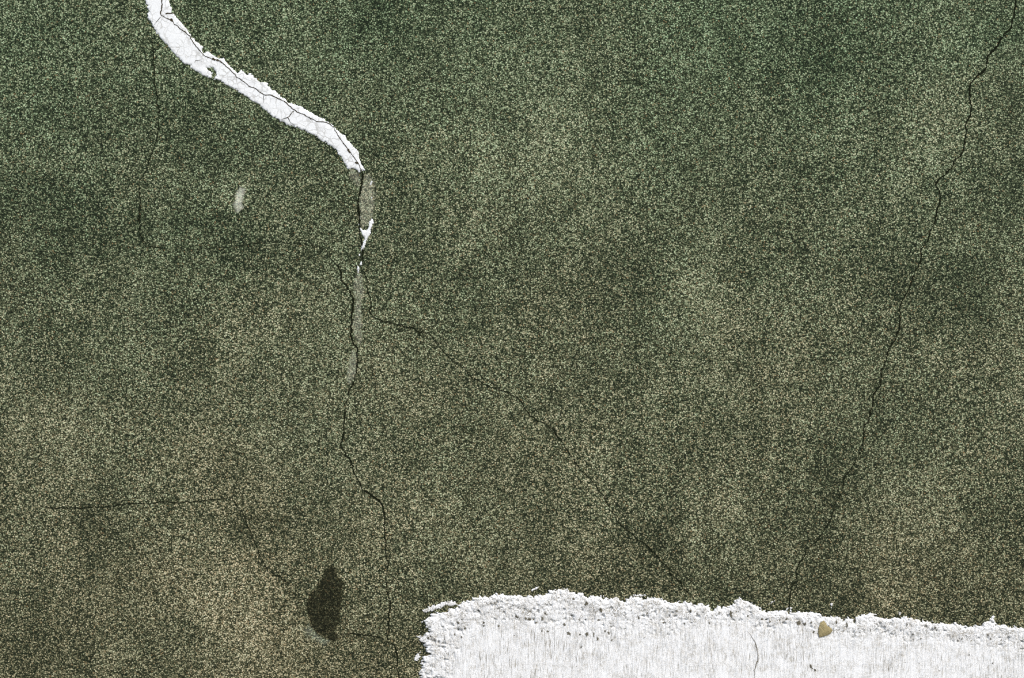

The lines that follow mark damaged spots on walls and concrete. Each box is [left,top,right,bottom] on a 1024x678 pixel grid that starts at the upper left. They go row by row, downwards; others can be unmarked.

crack [121,0,692,678]
crack [788,0,1017,608]
water stain [307,569,342,642]
peeling [422,600,457,613]
flaking render [785,607,871,637]